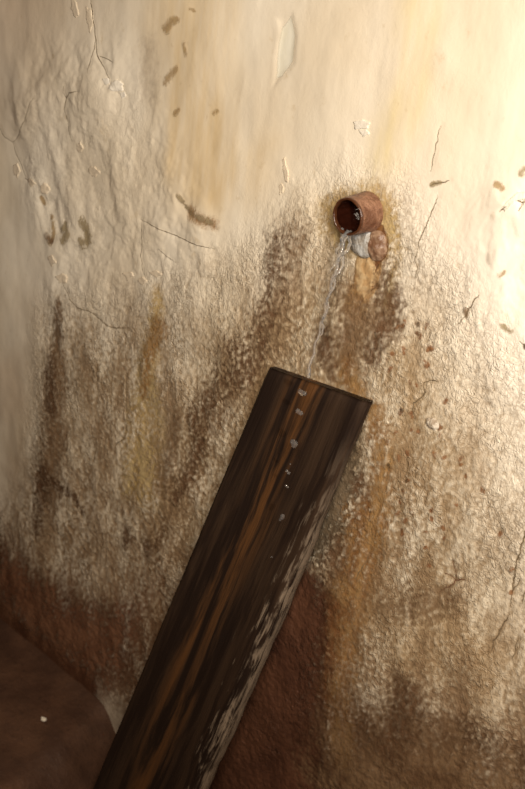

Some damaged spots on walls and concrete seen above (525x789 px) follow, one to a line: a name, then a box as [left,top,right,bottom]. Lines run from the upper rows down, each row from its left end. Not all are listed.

crack [87,4,113,87]
water stain [32,301,85,536]
water stain [123,288,178,504]
water stain [170,228,305,508]
water stain [318,267,406,382]
corrosion [322,184,429,339]
water stain [0,535,147,696]
water stain [210,475,525,789]
crack [491,535,525,651]